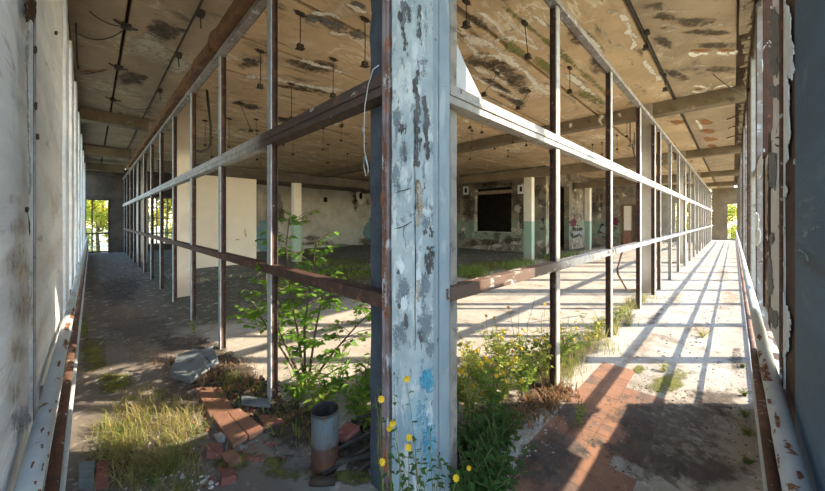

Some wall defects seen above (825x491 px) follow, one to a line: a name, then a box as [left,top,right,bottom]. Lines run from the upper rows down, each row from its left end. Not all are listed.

damp [126,20,191,75]
damp [278,59,347,93]
damp [305,11,365,40]
peeling [397,0,423,56]
peeling [390,60,431,191]
damp [464,9,550,107]
damp [647,3,738,72]
peeling [757,4,795,197]
corrosion [380,137,389,338]
peeling [393,179,435,357]
peeling [767,256,792,358]
corrosion [786,470,804,491]